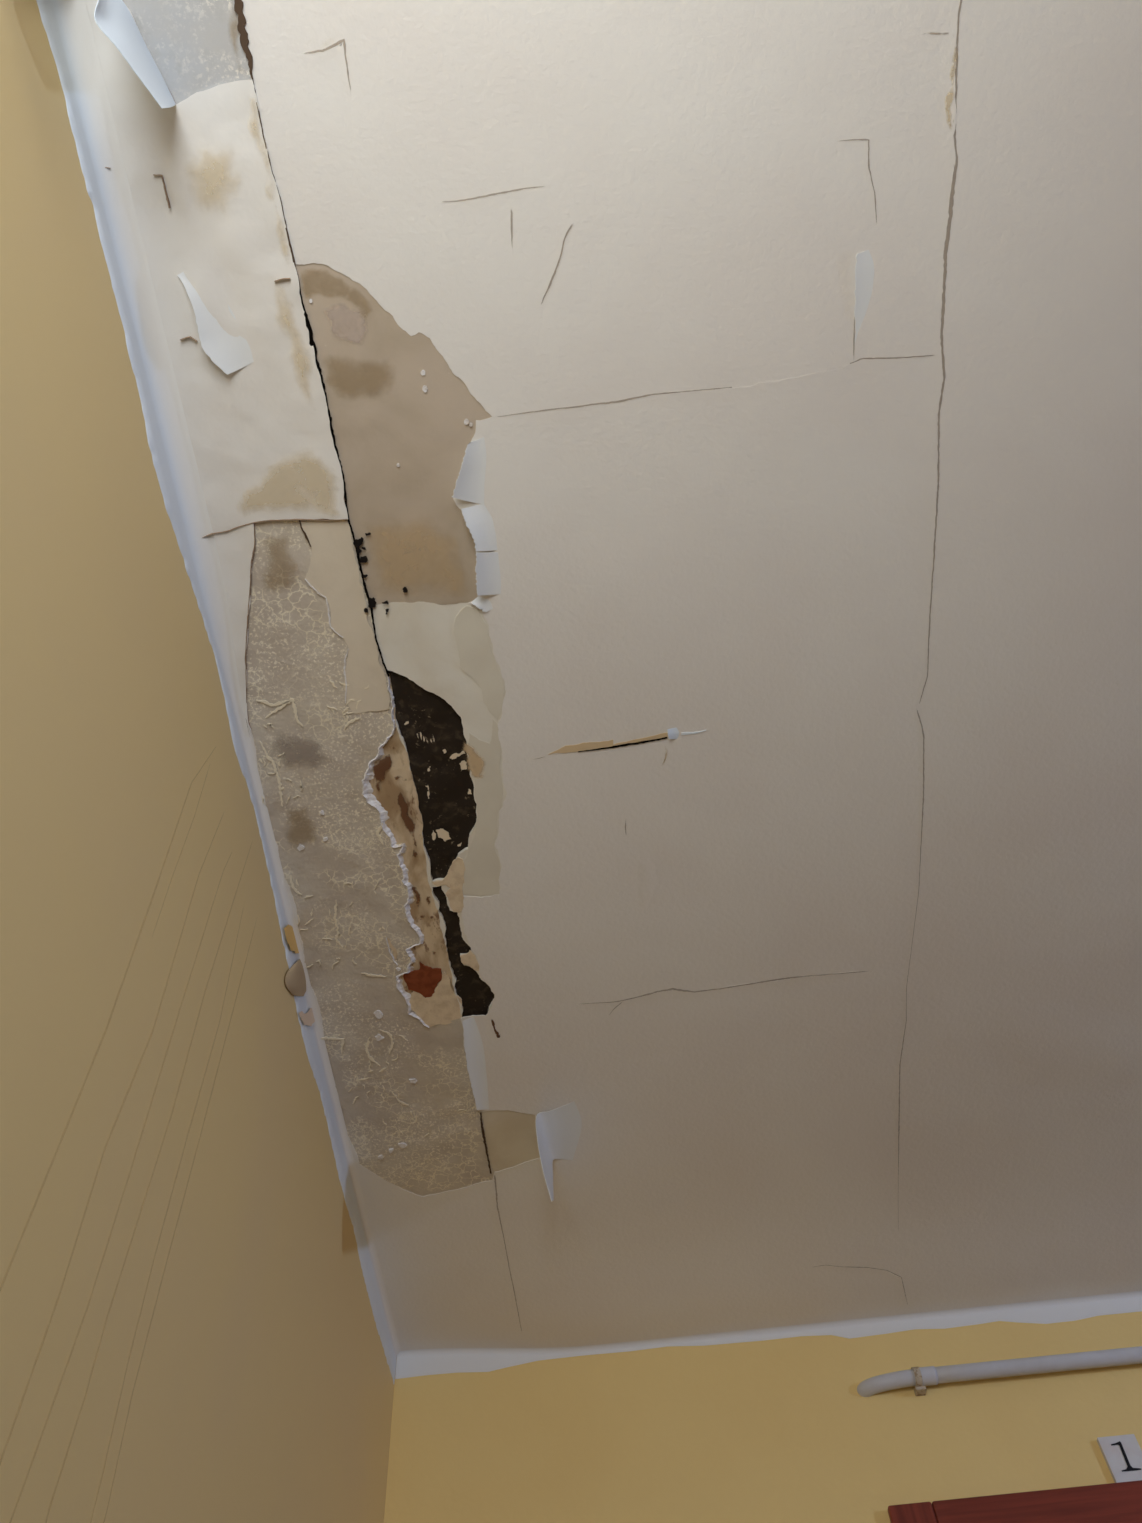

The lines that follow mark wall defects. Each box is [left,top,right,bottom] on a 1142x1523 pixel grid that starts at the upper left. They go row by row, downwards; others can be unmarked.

peeling [94,0,252,109]
crack [234,0,390,677]
crack [907,0,960,706]
water stain [353,533,371,578]
water stain [364,597,389,614]
flaking render [202,263,582,1202]
crack [548,728,706,755]
water stain [373,755,417,857]
crack [480,1113,492,1174]